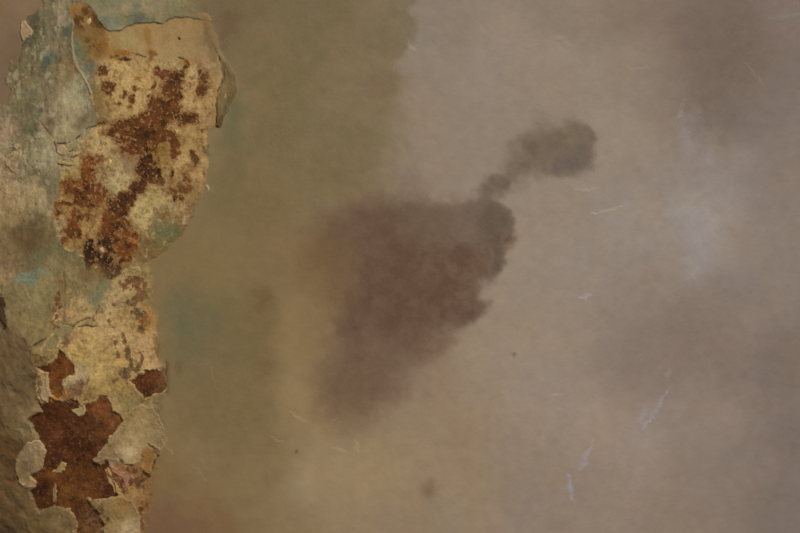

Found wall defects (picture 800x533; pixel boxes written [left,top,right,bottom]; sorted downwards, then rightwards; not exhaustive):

peeling [0,0,237,533]
rust [49,8,210,355]
damp [217,0,596,417]